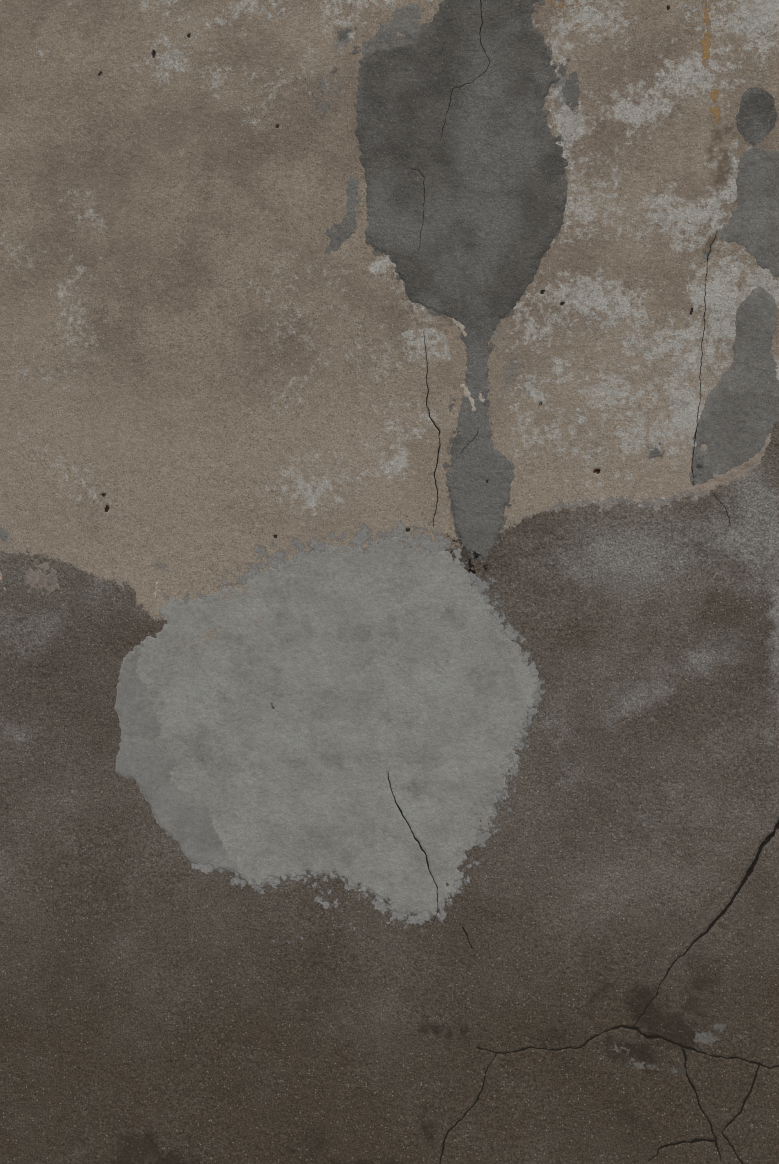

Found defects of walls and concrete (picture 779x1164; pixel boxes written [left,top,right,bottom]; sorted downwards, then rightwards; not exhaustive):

rust [701,1,711,66]
crack [423,331,478,527]
crack [691,231,731,526]
peeling [677,433,771,494]
crack [388,773,438,925]
crack [439,820,779,1164]